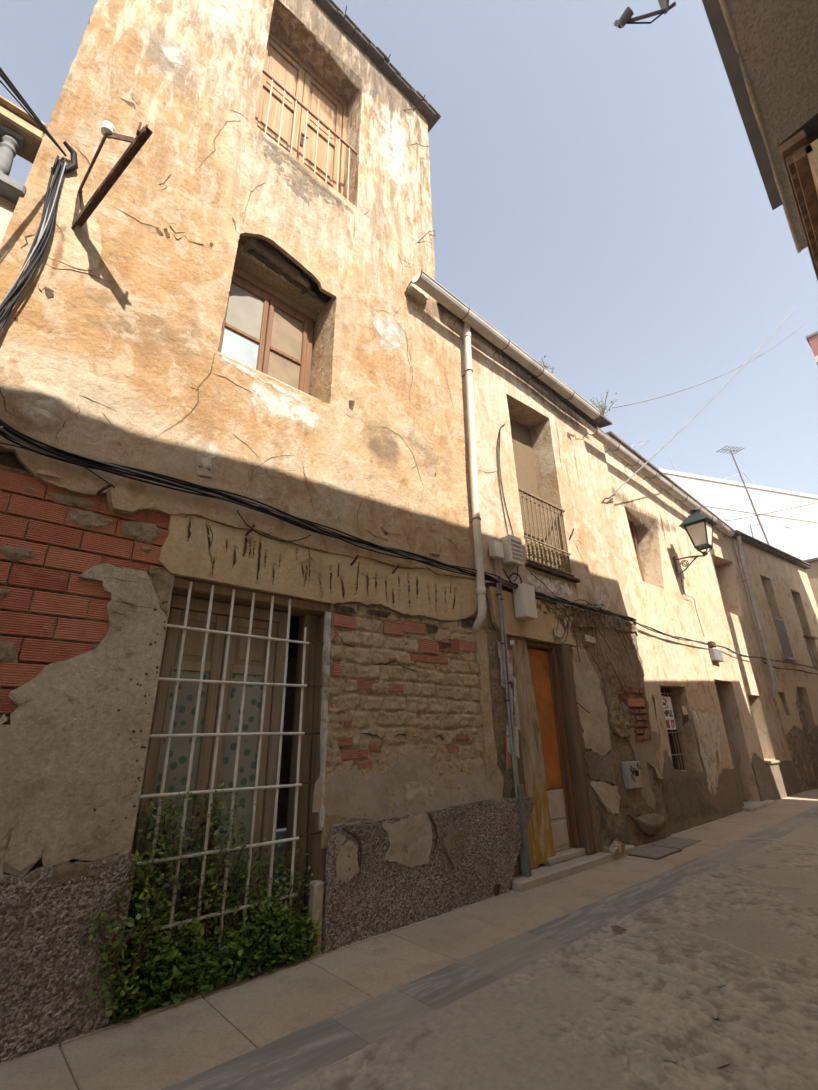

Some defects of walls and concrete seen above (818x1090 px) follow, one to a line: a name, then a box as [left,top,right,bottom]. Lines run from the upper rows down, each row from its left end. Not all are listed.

crack [153,354,282,440]
spalling [226,537,280,580]
flaking render [0,452,173,725]
peeling [296,552,520,798]
flaking render [619,686,659,741]
peeling [587,780,621,815]
peeling [0,825,43,875]